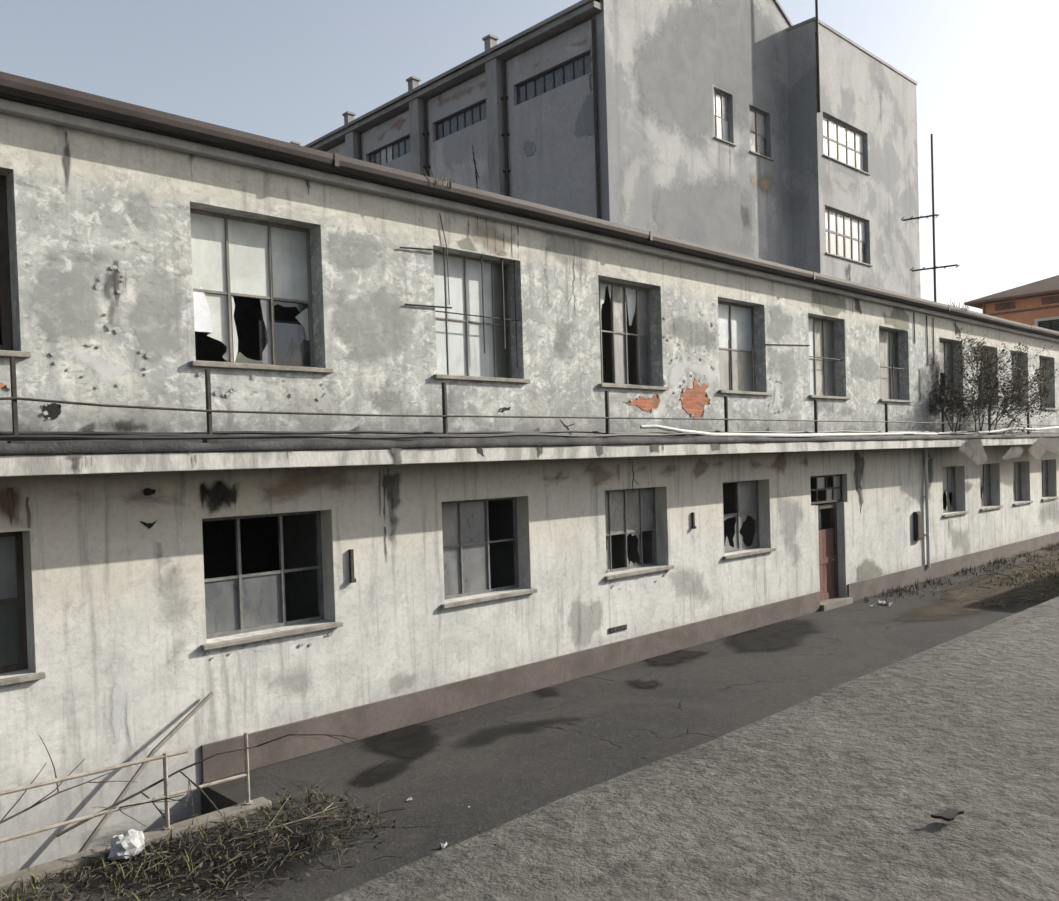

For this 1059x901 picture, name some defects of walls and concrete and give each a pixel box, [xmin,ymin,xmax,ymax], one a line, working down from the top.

flaking render [626,336,716,418]
water stain [200,481,237,506]
water stain [378,448,402,557]
water stain [854,452,864,504]